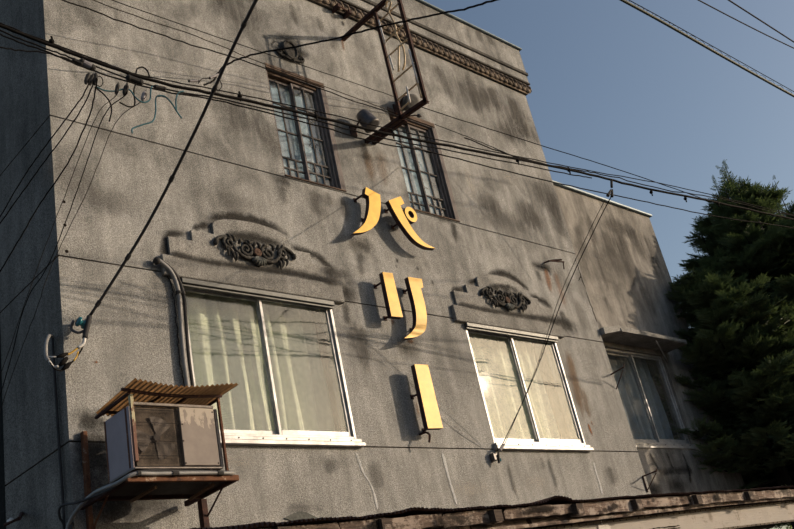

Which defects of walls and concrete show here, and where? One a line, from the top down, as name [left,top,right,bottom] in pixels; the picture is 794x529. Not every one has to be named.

corrosion [567,355,582,410]